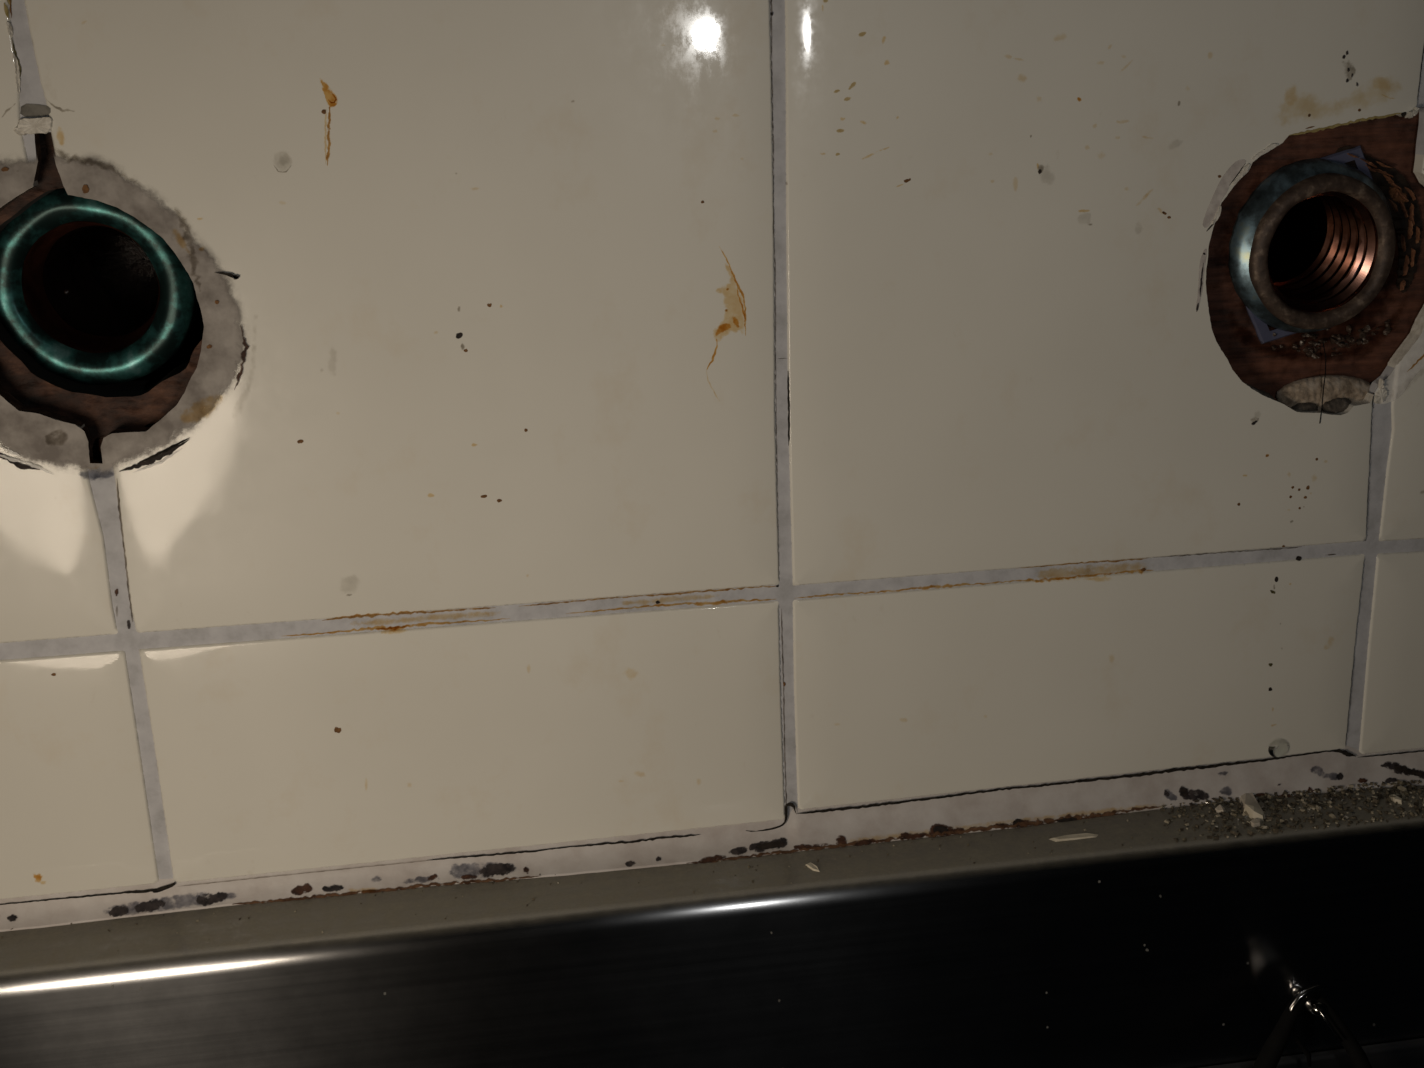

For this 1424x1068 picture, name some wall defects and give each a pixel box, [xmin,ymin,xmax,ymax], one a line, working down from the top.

spalling [1203,143,1278,232]
spalling [1336,146,1423,292]
spalling [1196,249,1207,312]
spalling [131,316,204,381]
spalling [1245,330,1424,414]
water stain [1381,762,1424,783]
water stain [1164,773,1230,801]
water stain [700,835,877,863]
water stain [457,863,529,880]
water stain [109,899,165,917]
water stain [196,893,228,906]
water stain [291,883,343,895]